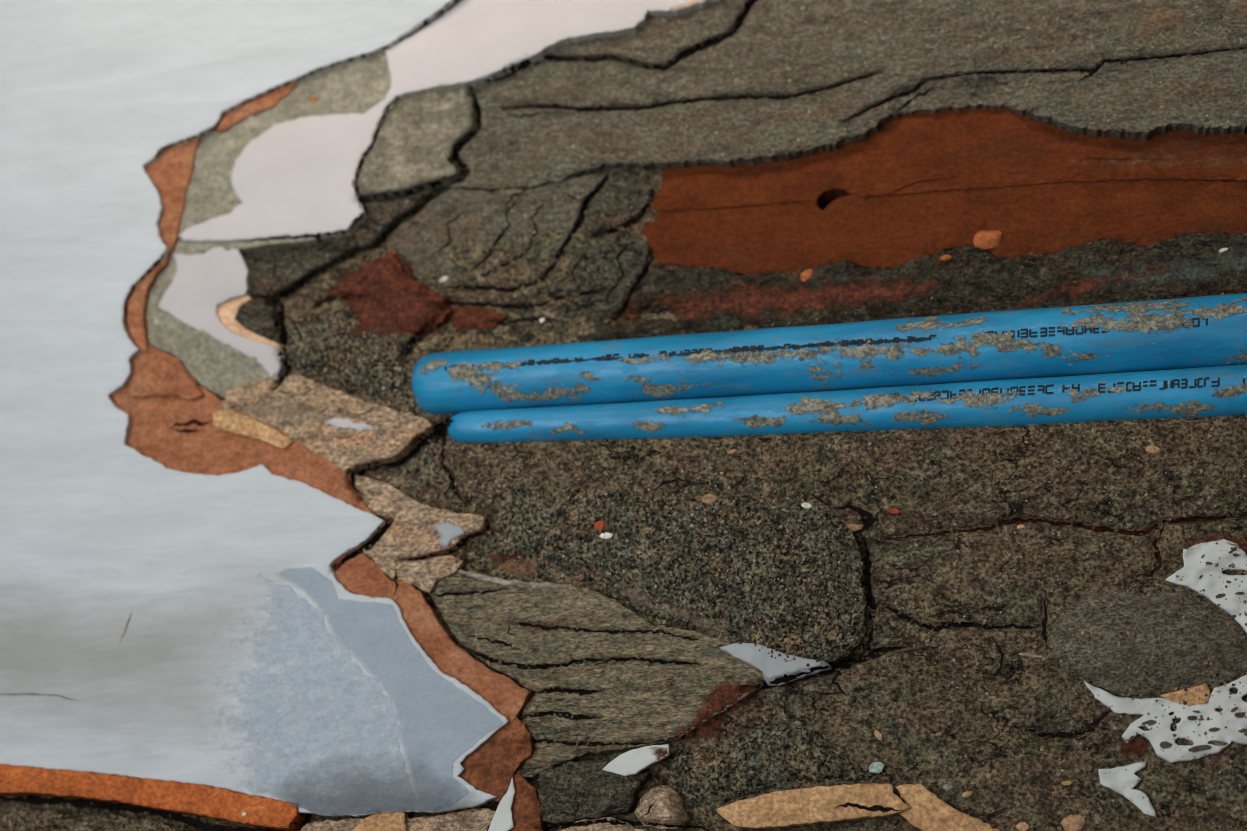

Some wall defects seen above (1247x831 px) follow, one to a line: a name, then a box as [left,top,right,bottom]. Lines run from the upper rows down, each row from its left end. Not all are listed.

peeling [390,171,654,329]
crack [244,0,1247,387]
spalling [973,231,1002,250]
flaking render [111,50,573,831]
spalling [594,520,613,539]
crack [432,588,509,597]
peeling [1165,539,1247,634]
crack [470,621,702,746]
peeling [720,643,832,686]
peeling [602,744,670,777]
flaking render [869,762,884,774]
peeling [1084,675,1247,817]